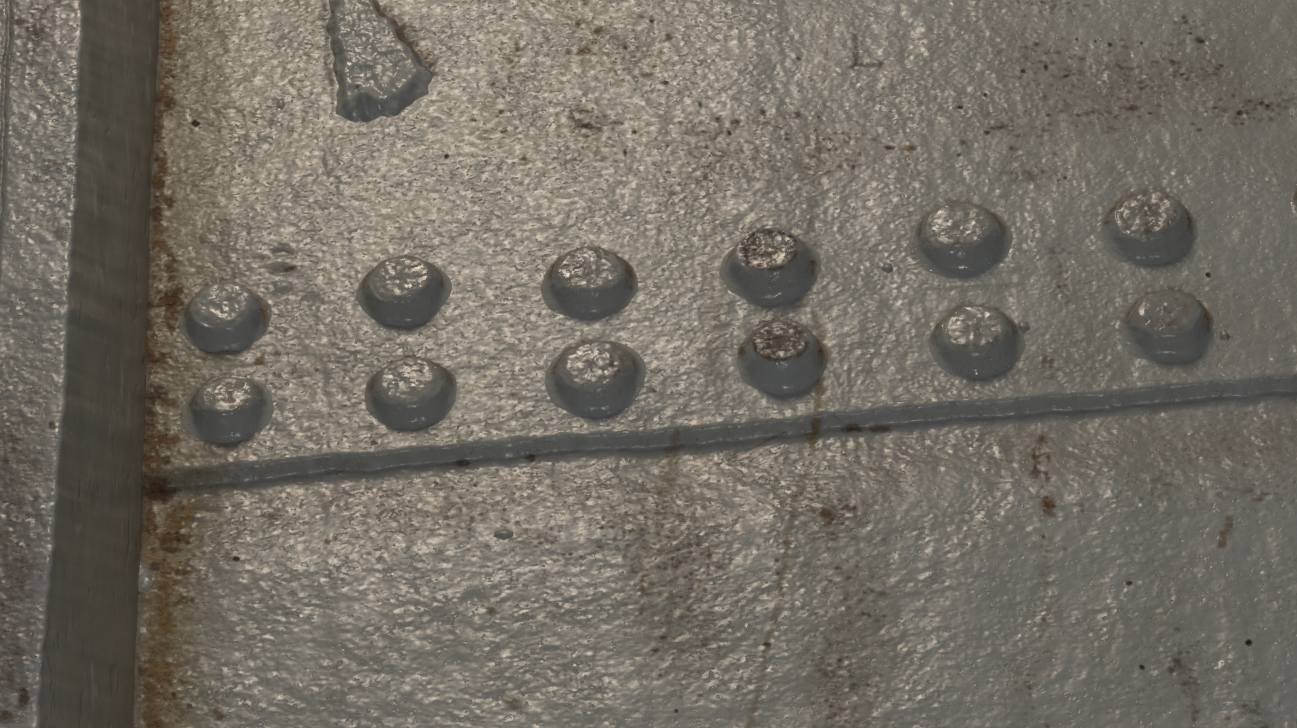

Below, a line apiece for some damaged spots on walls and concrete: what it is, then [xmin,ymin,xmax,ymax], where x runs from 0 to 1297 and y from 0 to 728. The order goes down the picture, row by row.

rust [742,229,797,271]
rust [751,323,822,361]
rust [132,0,202,728]